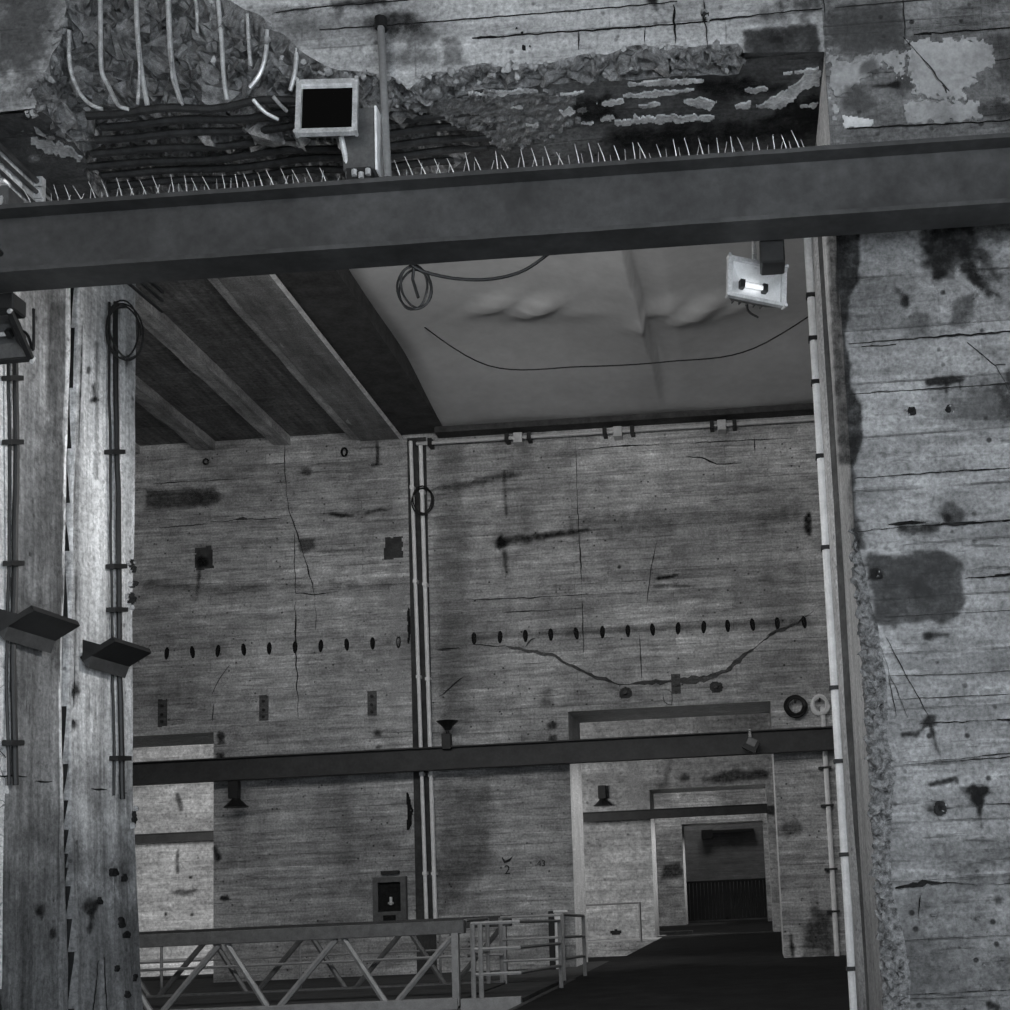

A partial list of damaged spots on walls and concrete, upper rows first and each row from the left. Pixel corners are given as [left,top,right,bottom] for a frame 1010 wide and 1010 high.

spalling [21,0,746,198]
peeling [735,35,995,129]
damp [921,227,998,316]
damp [826,234,964,640]
crack [850,331,1010,394]
crack [855,468,1008,479]
damp [995,371,1010,418]
crack [437,437,812,705]
crack [881,610,1010,724]
spalling [848,528,1010,1010]
crack [905,753,1010,764]